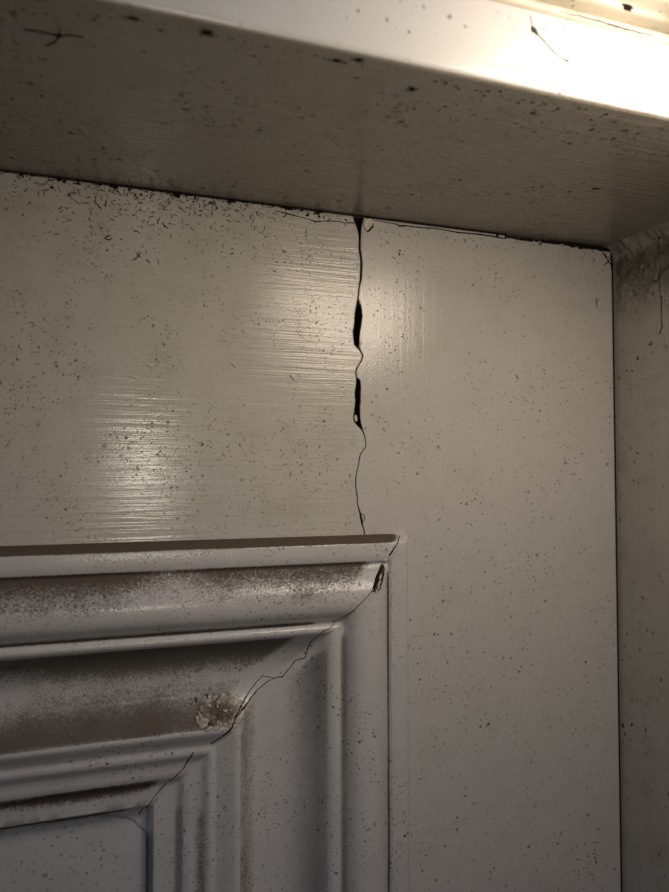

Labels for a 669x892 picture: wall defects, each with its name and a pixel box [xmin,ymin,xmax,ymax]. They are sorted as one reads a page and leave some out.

crack [0,169,613,531]
crack [31,536,400,888]